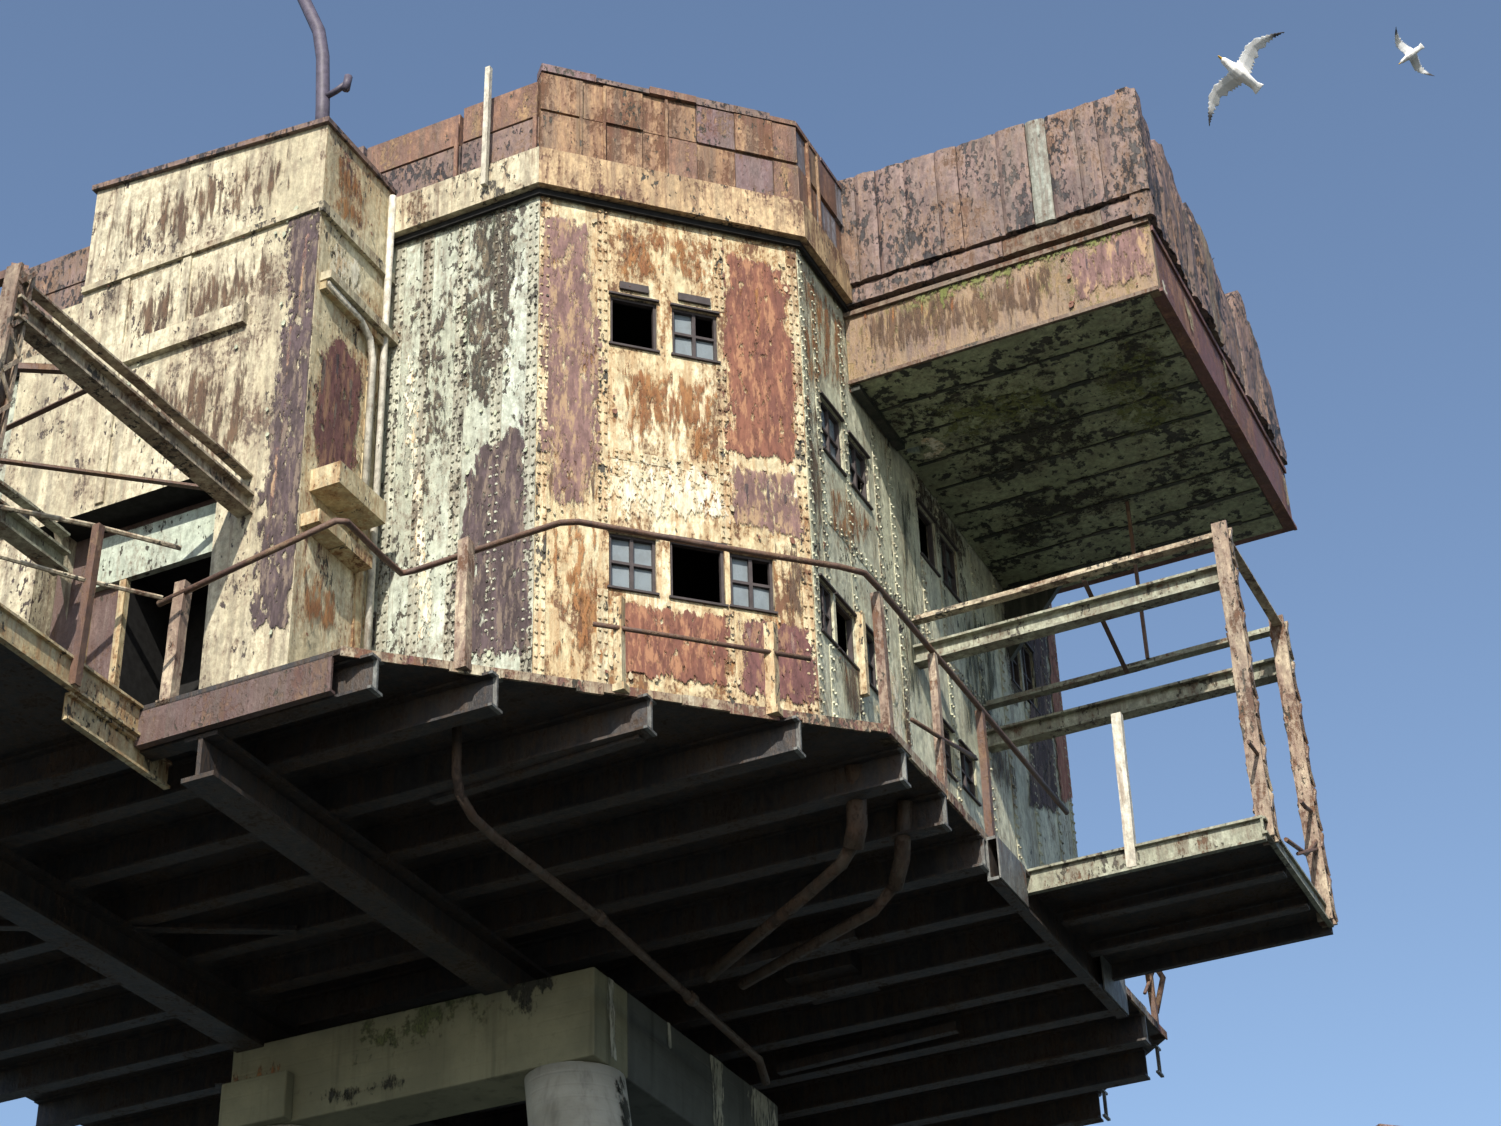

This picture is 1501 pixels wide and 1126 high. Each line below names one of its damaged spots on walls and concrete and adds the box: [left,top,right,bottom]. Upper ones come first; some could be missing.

damp [402,354,432,641]
peeling [399,206,804,658]
rust [803,272,878,551]
rust [861,264,1075,360]